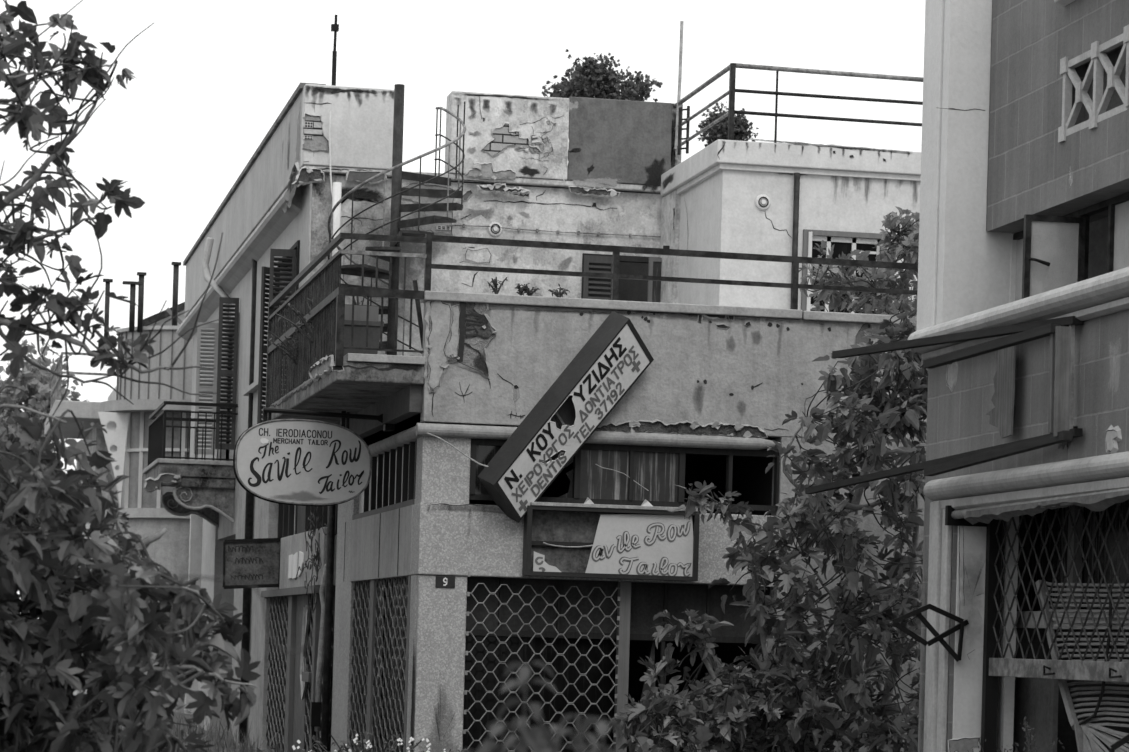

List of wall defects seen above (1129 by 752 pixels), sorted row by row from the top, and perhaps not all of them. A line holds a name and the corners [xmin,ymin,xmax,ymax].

damp [306,86,394,104]
flaking render [282,112,329,213]
flaking render [346,170,388,184]
flaking render [401,121,554,236]
flaking render [423,300,497,394]
flaking render [596,419,768,439]